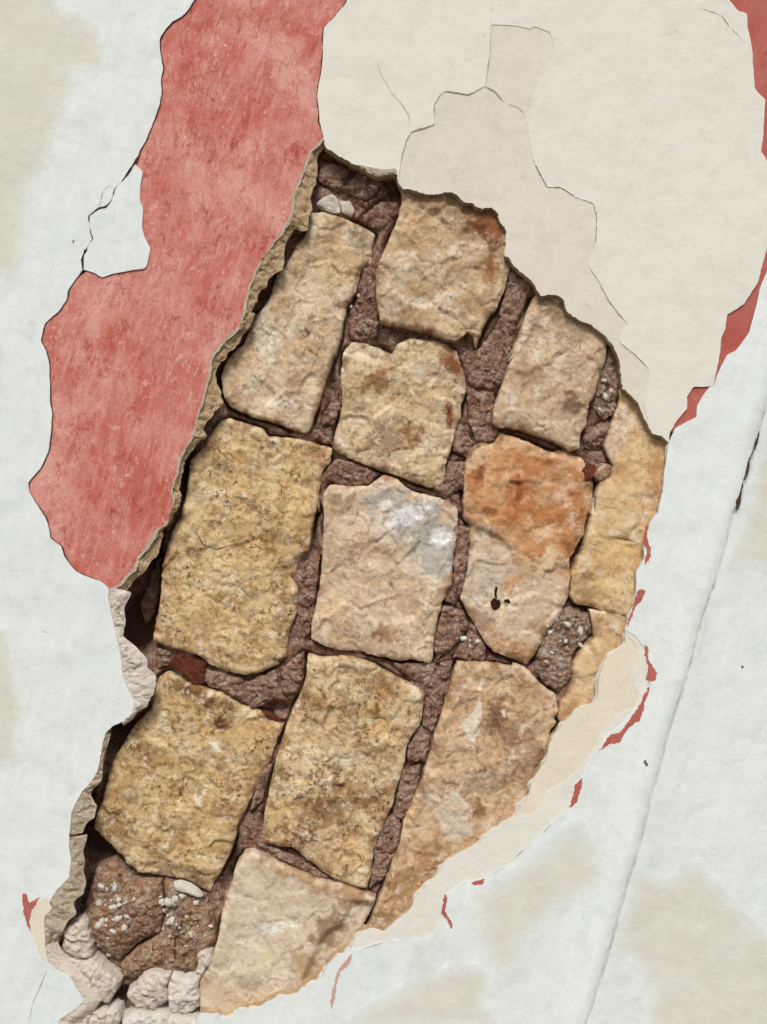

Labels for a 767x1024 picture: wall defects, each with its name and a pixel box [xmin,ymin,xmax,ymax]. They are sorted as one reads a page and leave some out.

crack [377,2,524,181]
peeling [730,0,767,160]
crack [29,0,196,582]
peeling [29,0,506,725]
crack [534,161,597,243]
peeling [671,250,767,432]
flaking render [195,255,669,1023]
flaking render [22,733,111,1024]
peeling [174,880,204,897]
damp [336,765,613,1024]
damp [609,857,767,1024]